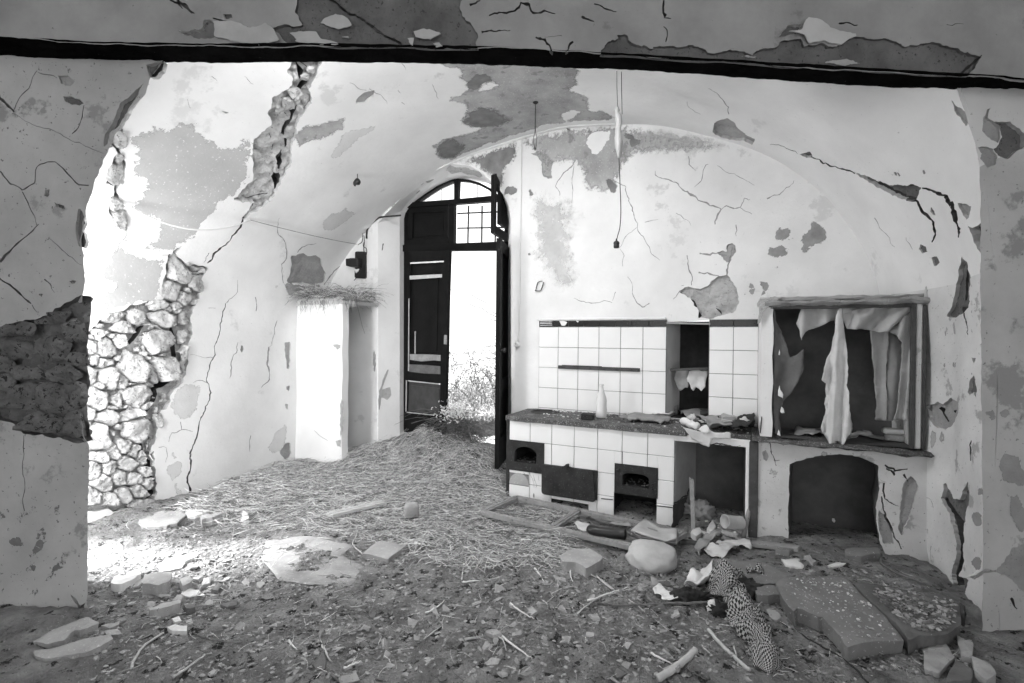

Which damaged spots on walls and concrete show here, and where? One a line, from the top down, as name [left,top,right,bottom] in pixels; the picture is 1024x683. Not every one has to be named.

crack [470,0,616,55]
flaking render [600,17,981,78]
crack [773,144,855,174]
flaking render [952,101,1024,167]
crack [0,161,89,312]
crack [655,156,794,296]
crack [874,187,961,248]
flaking render [0,61,326,512]
flaking render [680,275,780,324]
flaking render [947,257,971,318]
crack [159,281,277,493]
flaking render [941,454,1024,592]